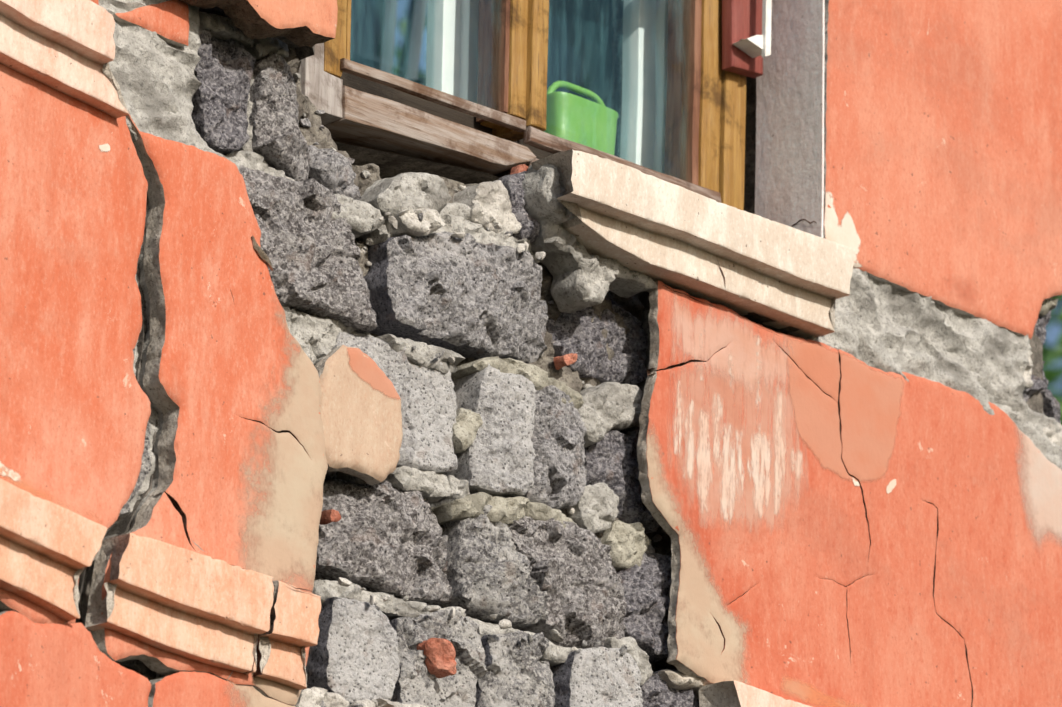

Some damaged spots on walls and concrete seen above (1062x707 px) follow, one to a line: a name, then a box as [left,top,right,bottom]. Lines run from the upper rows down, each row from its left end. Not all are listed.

crack [82,195,166,631]
spalling [98,0,746,707]
crack [647,362,690,376]
spalling [674,192,1062,541]
crack [227,615,271,681]